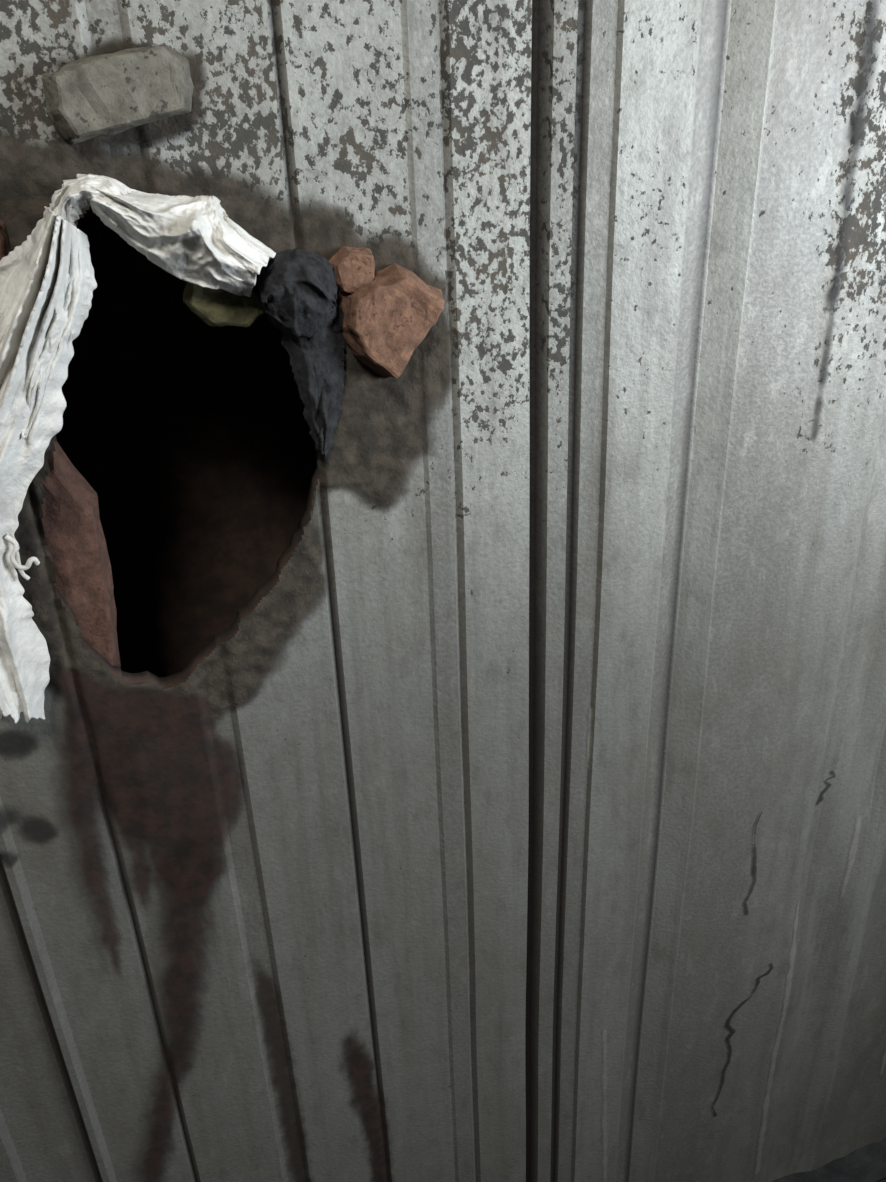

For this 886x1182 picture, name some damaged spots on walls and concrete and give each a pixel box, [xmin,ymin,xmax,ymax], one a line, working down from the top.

corrosion [814,2,877,439]
corrosion [49,671,242,1182]
crack [744,812,762,915]
corrosion [258,974,310,1182]
corrosion [345,1037,391,1182]
crack [712,963,773,1117]